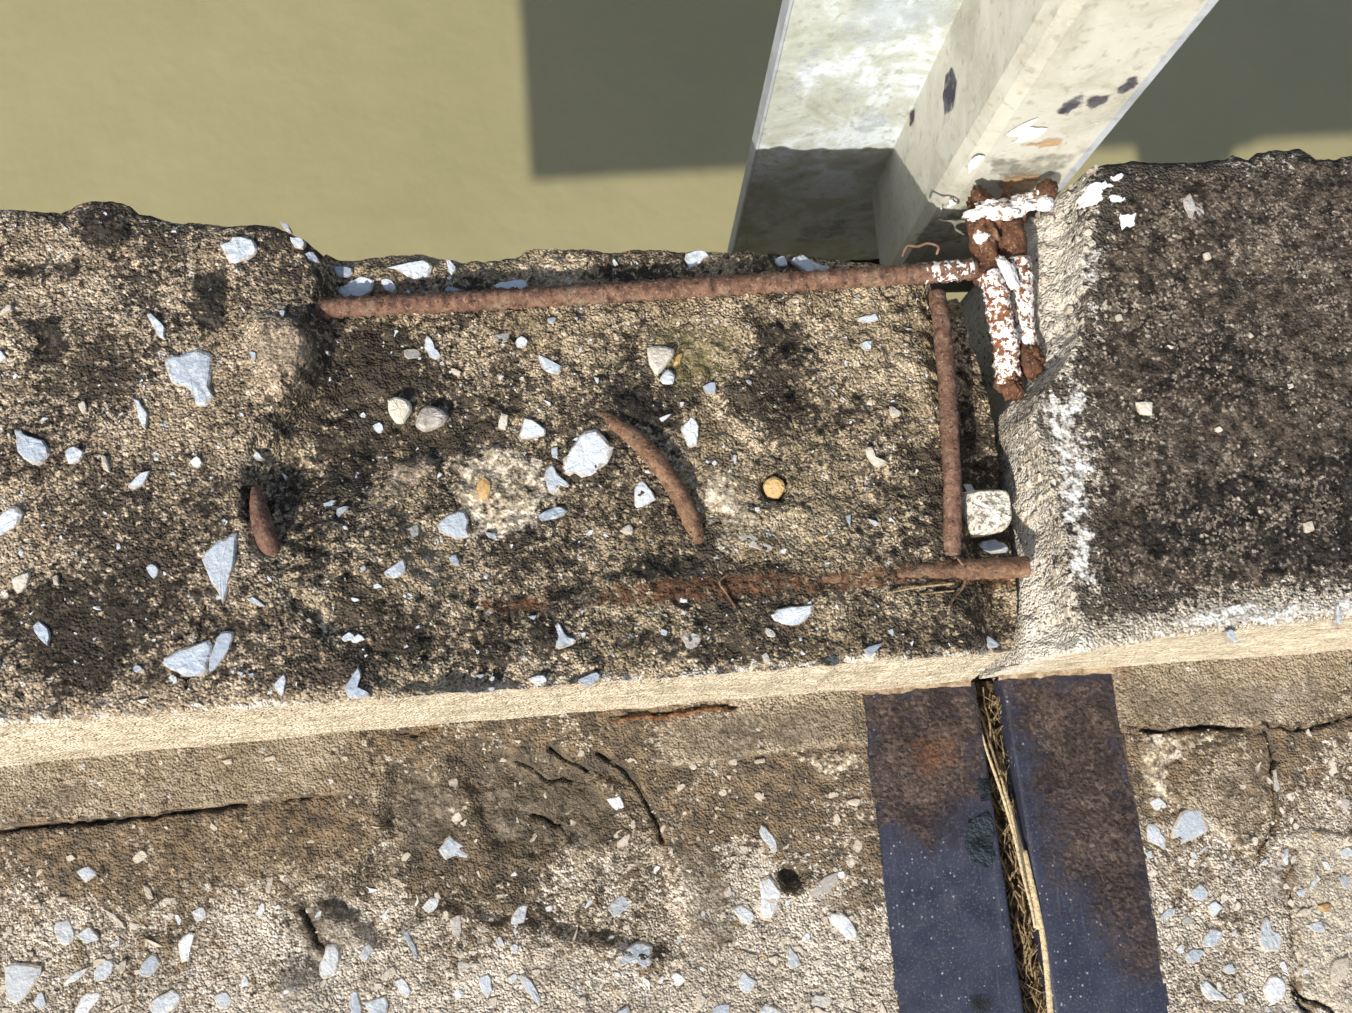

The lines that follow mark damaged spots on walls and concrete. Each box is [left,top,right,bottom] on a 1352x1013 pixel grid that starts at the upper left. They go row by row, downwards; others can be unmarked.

corrosion [999,176,1041,194]
water stain [1042,155,1352,627]
spalling [241,221,1077,699]
corrosion [597,561,1011,604]
crack [0,804,241,832]
crack [1129,715,1352,844]
crack [1286,864,1333,1013]